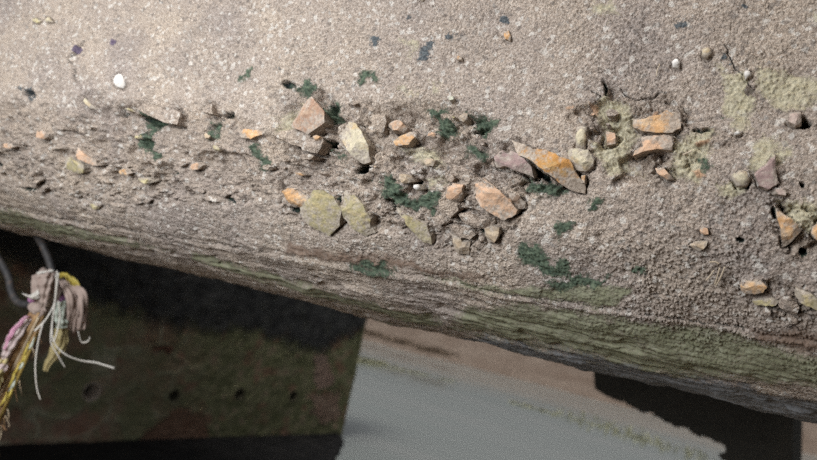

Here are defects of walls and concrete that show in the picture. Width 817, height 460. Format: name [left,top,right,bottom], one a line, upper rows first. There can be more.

spalling [0,85,747,256]
spalling [771,199,817,261]
spalling [739,278,817,327]